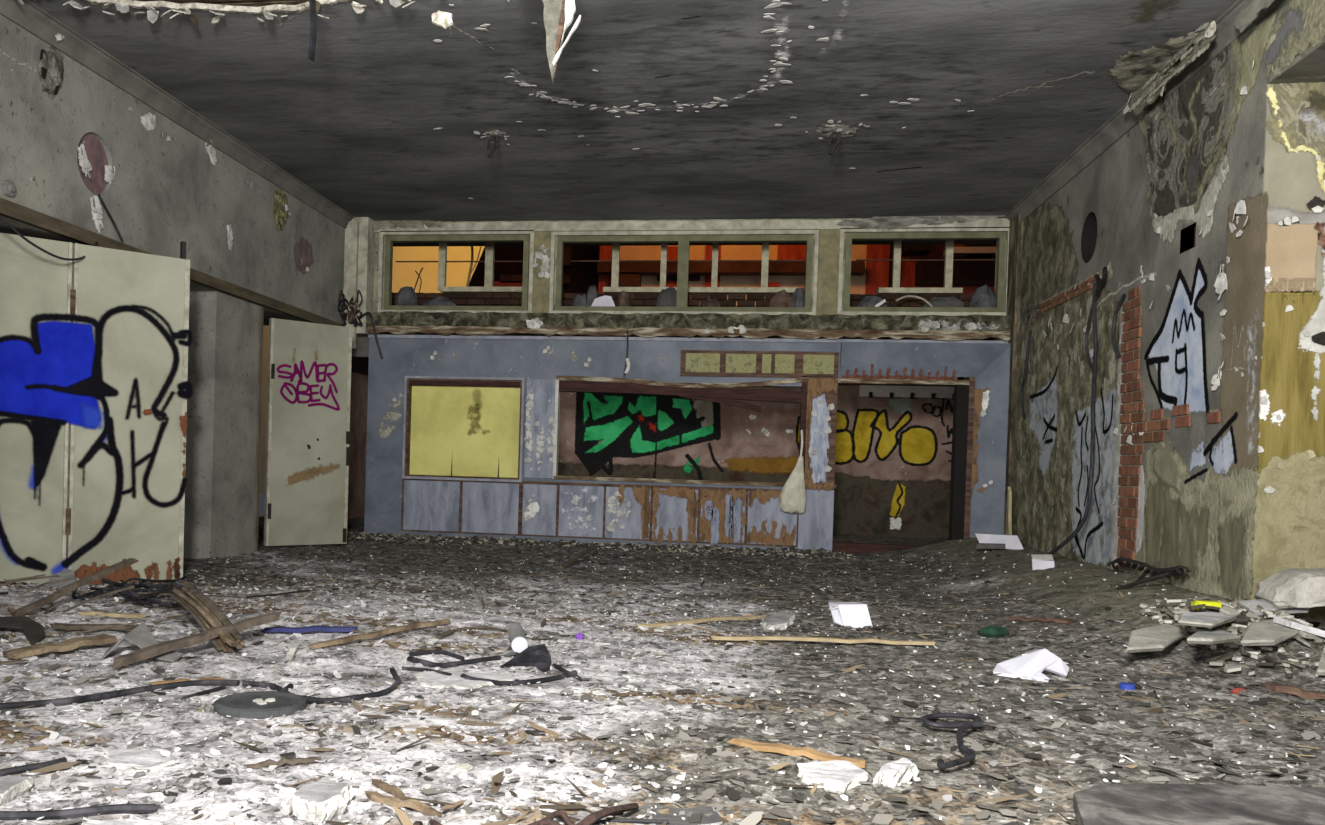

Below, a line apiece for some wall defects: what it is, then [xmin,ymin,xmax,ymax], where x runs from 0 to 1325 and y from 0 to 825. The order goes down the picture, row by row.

spalling [63,0,416,26]
peeling [808,0,849,53]
peeling [505,0,793,117]
leakage [1265,0,1325,179]
flaking render [1012,0,1325,601]
peeling [918,320,1001,332]
peeling [980,390,990,417]
rust [74,557,181,584]
spalling [1289,606,1325,620]